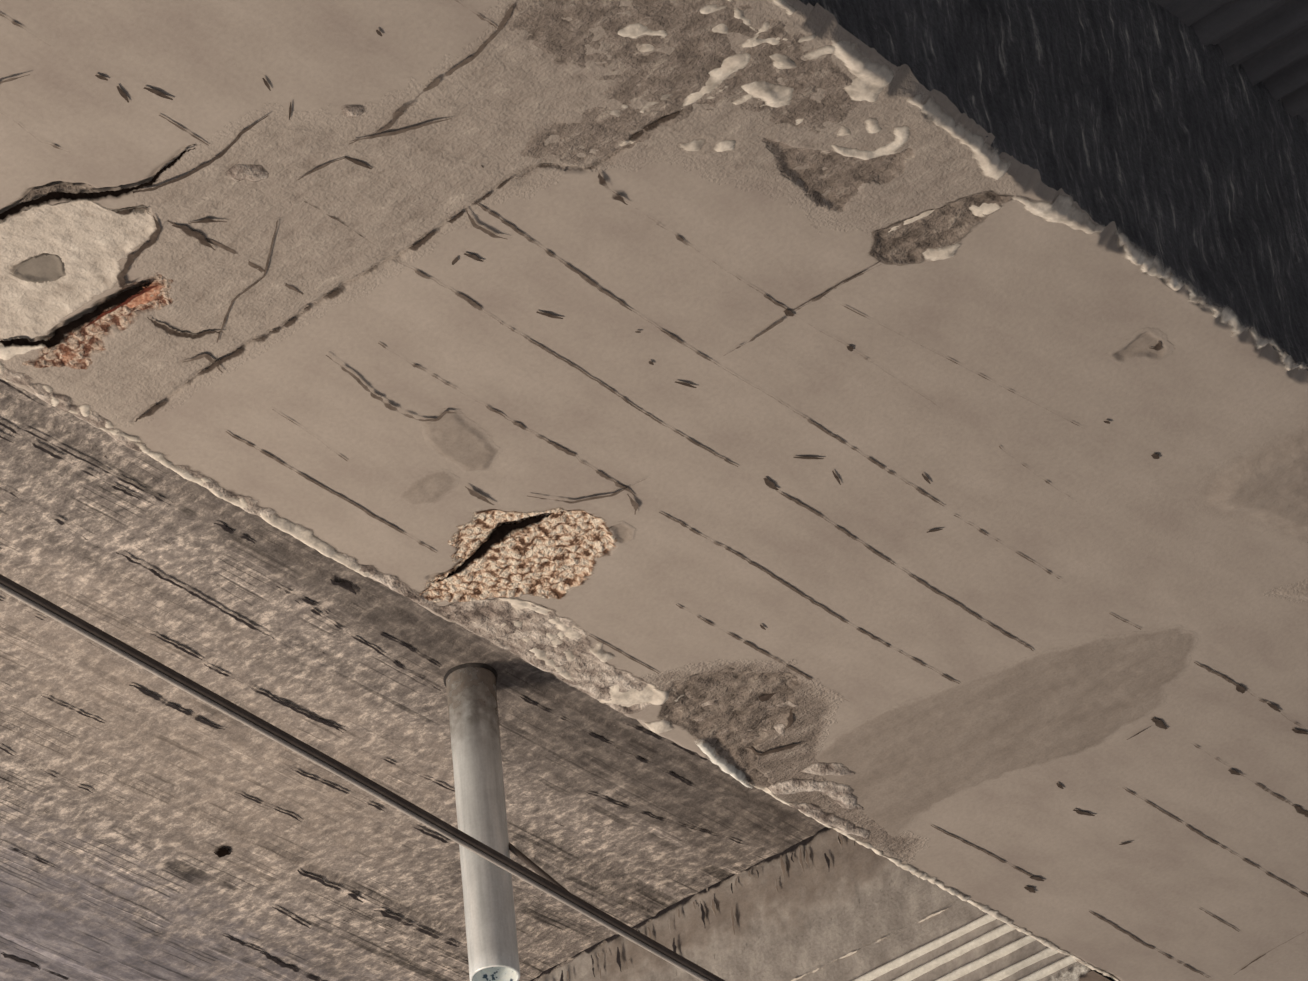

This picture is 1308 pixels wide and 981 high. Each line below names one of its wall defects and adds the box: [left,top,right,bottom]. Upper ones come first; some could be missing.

crack [0,115,268,221]
crack [298,4,515,180]
damp [0,0,1019,428]
crack [409,164,628,251]
crack [629,111,680,141]
peeling [681,0,894,109]
spalling [761,119,915,212]
spalling [870,95,1104,266]
crack [0,218,343,422]
spalling [1119,234,1305,371]
spalling [0,199,1118,981]
damp [816,625,1199,837]